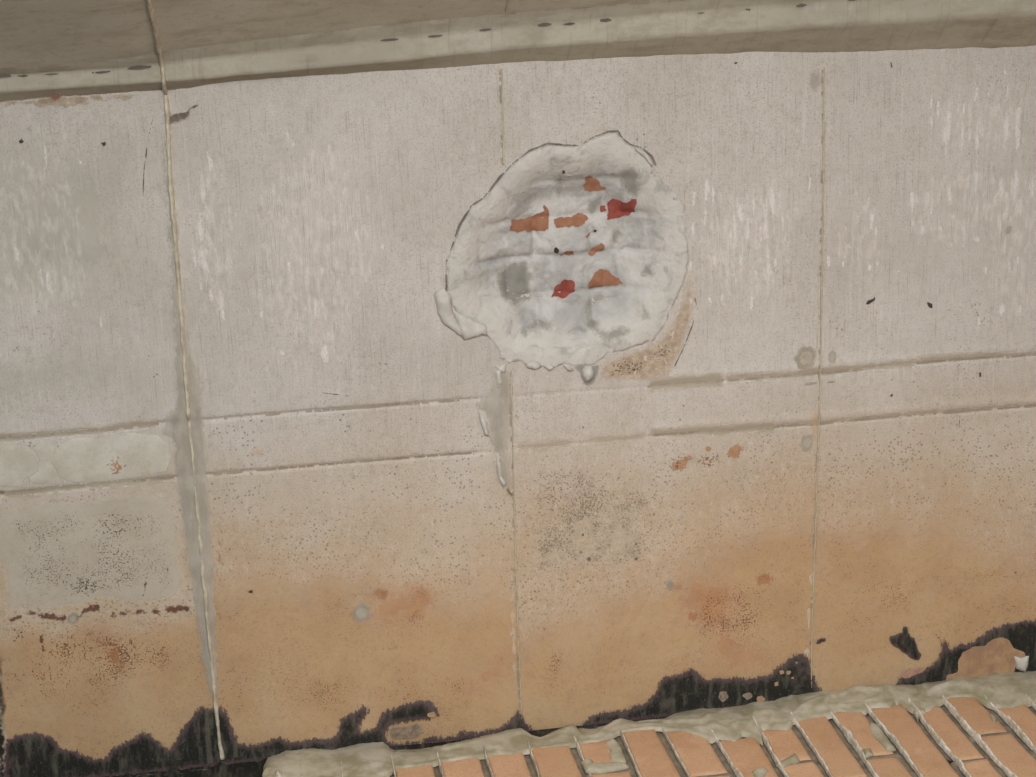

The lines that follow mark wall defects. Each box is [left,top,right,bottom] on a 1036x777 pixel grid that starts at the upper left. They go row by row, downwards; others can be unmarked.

spalling [434,130,693,385]
water stain [257,452,471,471]
rust [671,444,743,470]
water stain [652,405,1036,436]
water stain [0,474,189,621]
rust [0,526,1036,761]